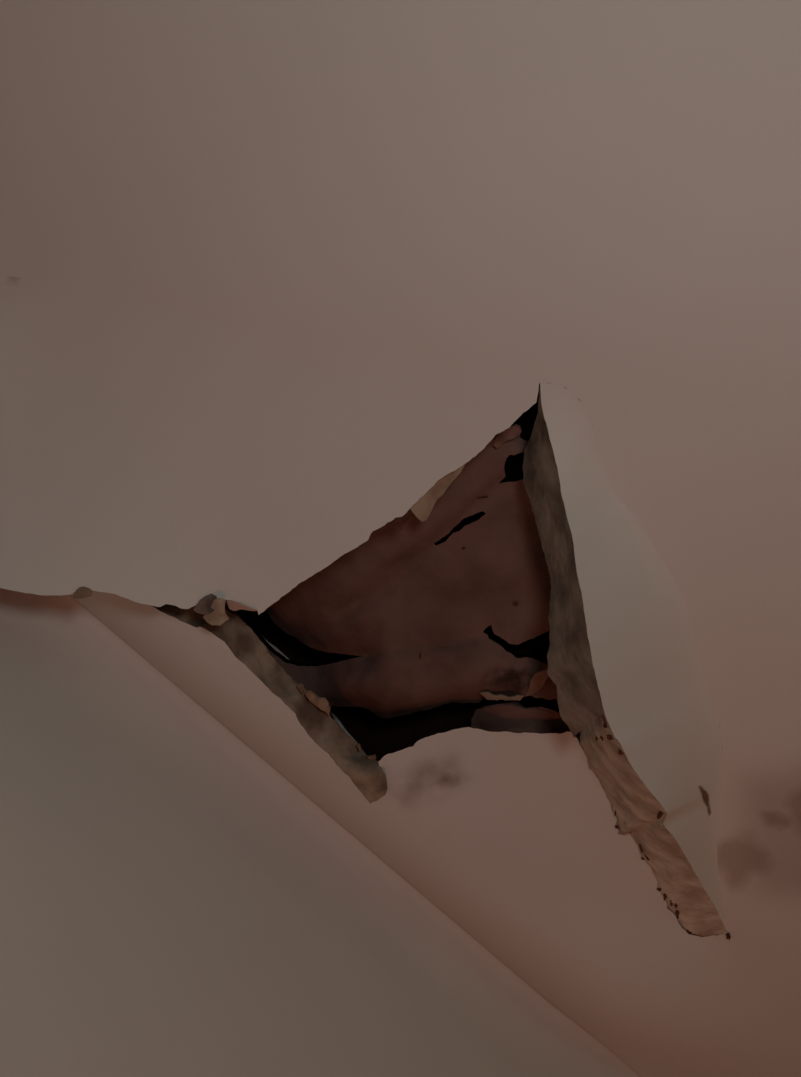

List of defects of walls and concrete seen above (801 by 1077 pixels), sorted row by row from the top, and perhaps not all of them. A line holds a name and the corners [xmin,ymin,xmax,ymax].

spalling [151,603,387,803]
spalling [522,389,604,737]